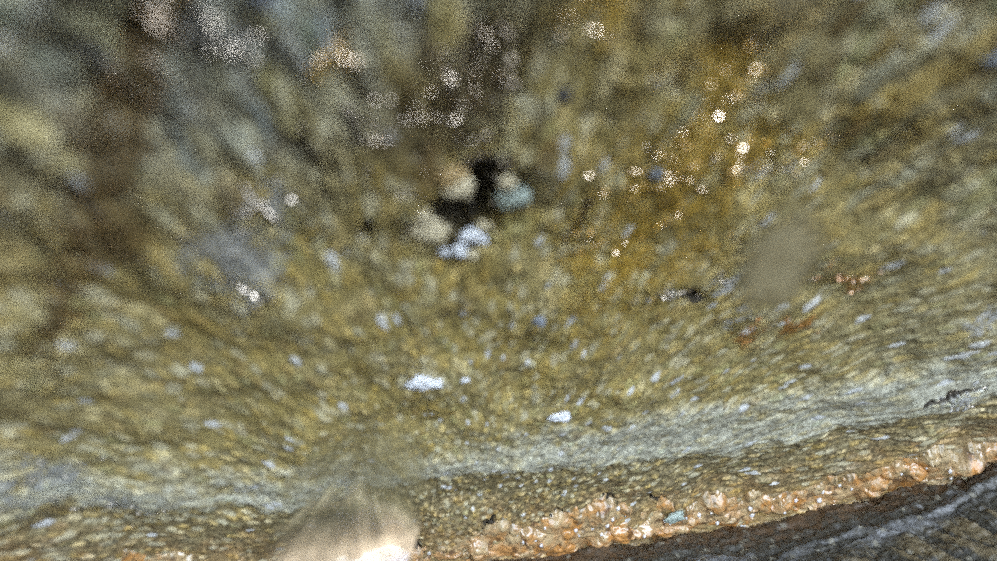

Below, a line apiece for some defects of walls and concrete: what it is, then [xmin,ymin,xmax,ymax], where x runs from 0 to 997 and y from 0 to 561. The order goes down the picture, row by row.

spalling [410,155,532,261]
rust [408,441,997,561]
rust [121,548,196,561]